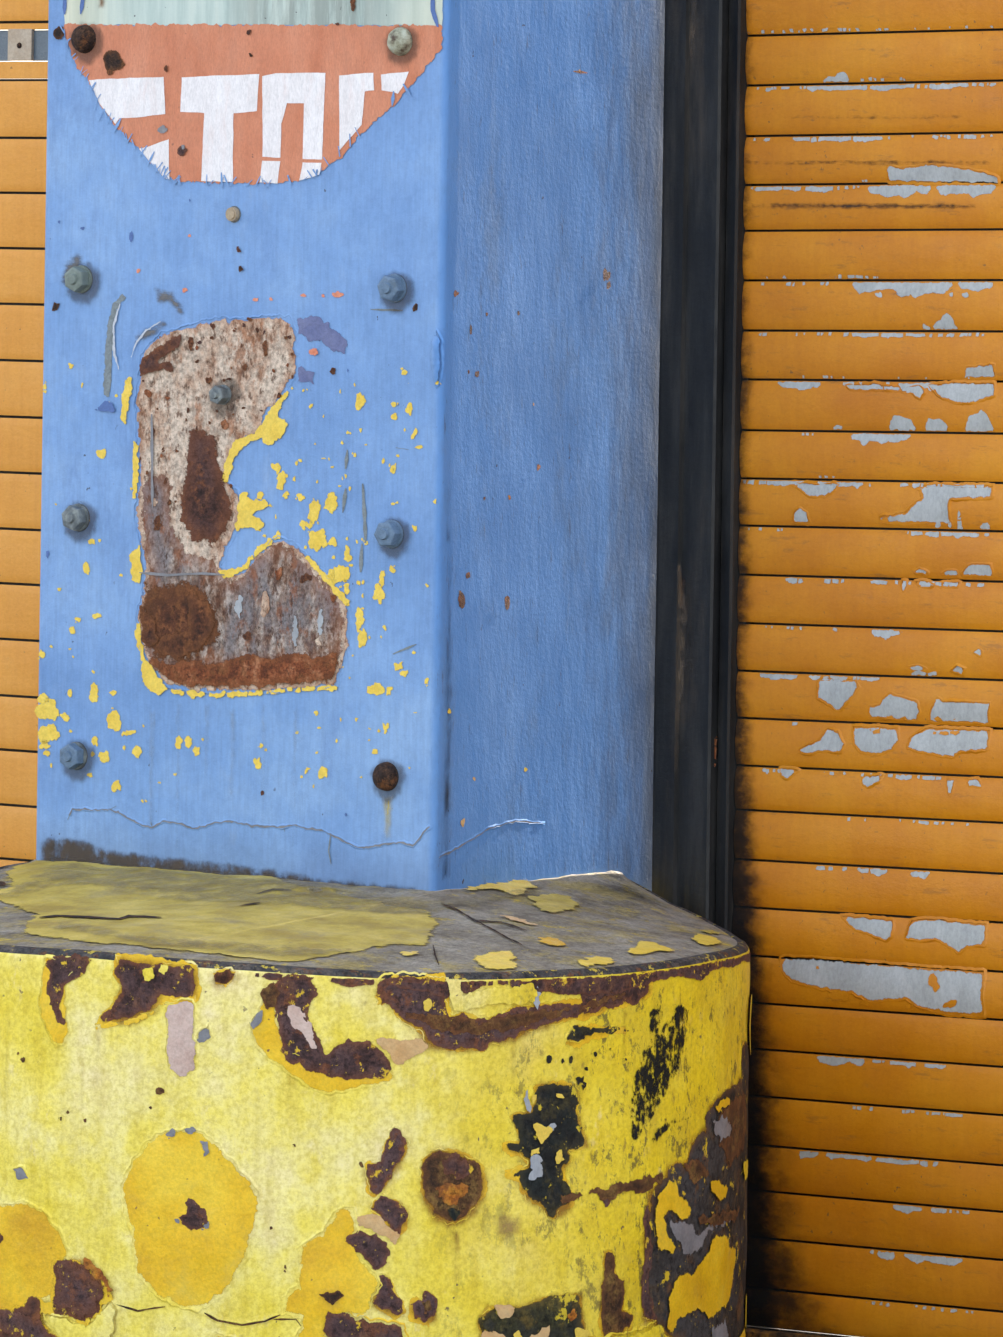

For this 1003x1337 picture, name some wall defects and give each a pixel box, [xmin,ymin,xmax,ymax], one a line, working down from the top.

corrosion [133,313,353,695]
peeling [134,443,396,699]
peeling [760,673,993,798]
crack [67,806,432,864]
corrosion [92,953,238,1080]
peeling [248,971,397,1096]
peeling [779,913,989,1019]
corrosion [322,952,752,1337]
corrosion [0,1254,115,1337]
peeling [0,1199,121,1337]
peeling [119,1126,273,1314]
peeling [278,1205,383,1337]